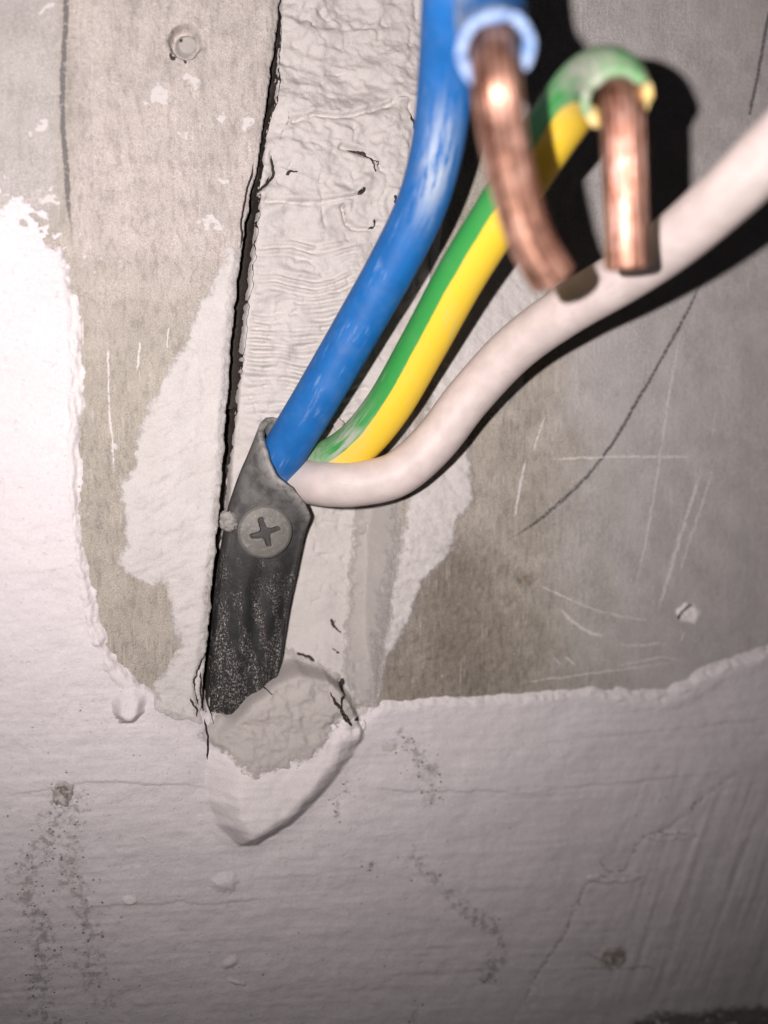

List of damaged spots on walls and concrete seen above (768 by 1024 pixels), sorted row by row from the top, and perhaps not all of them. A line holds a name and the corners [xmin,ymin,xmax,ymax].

crack [190,2,298,759]
peeling [66,293,136,687]
spalling [676,603,701,625]
crack [296,619,359,726]
peeling [379,645,768,711]